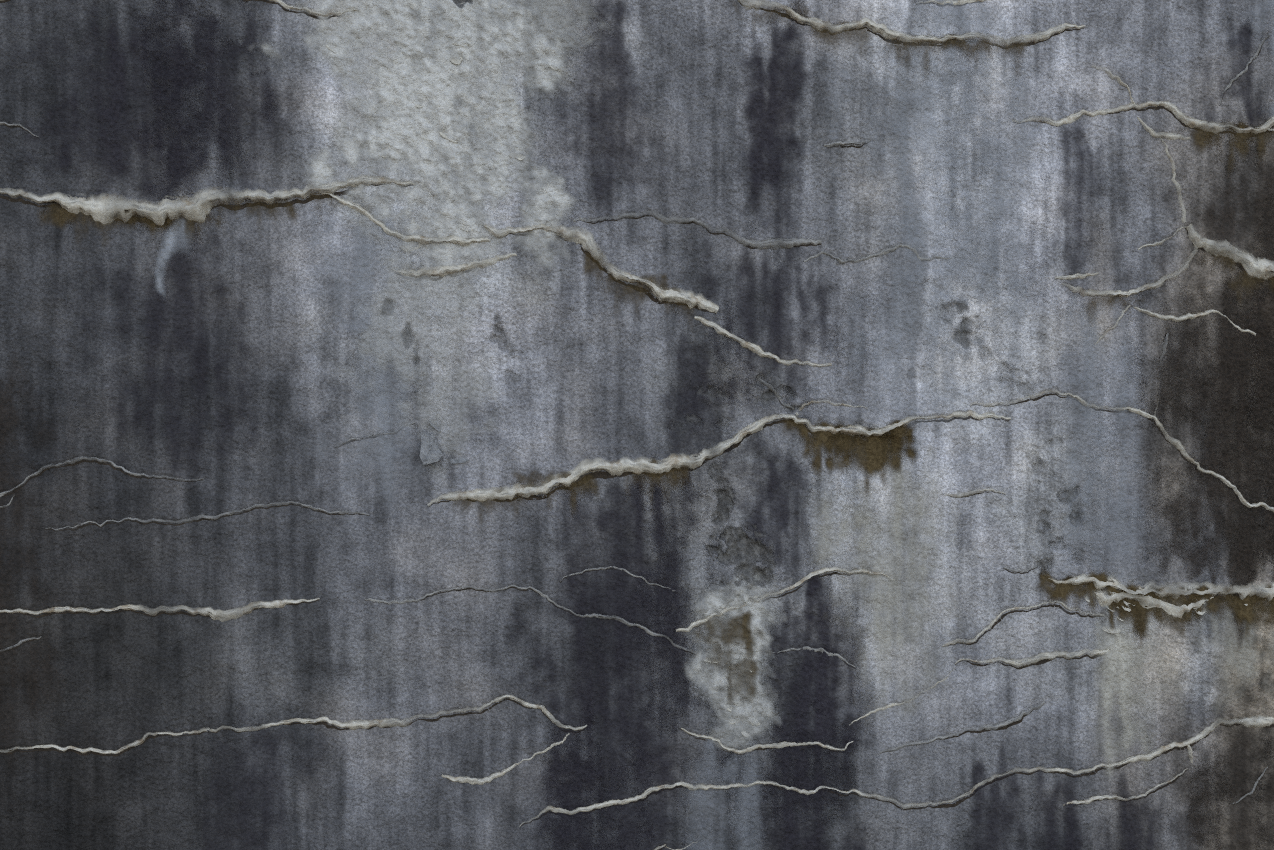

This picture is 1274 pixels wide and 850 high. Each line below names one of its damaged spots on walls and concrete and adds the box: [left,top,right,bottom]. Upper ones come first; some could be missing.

water stain [745,27,805,200]
crack [0,176,1274,513]
water stain [1204,162,1274,506]
peeling [420,419,468,465]
water stain [749,456,803,562]
crack [0,598,320,653]
crack [0,695,587,785]
water stain [542,477,683,850]
water stain [746,575,856,850]
crack [520,702,1274,828]
crack [931,565,1274,688]
peeling [1084,590,1140,636]